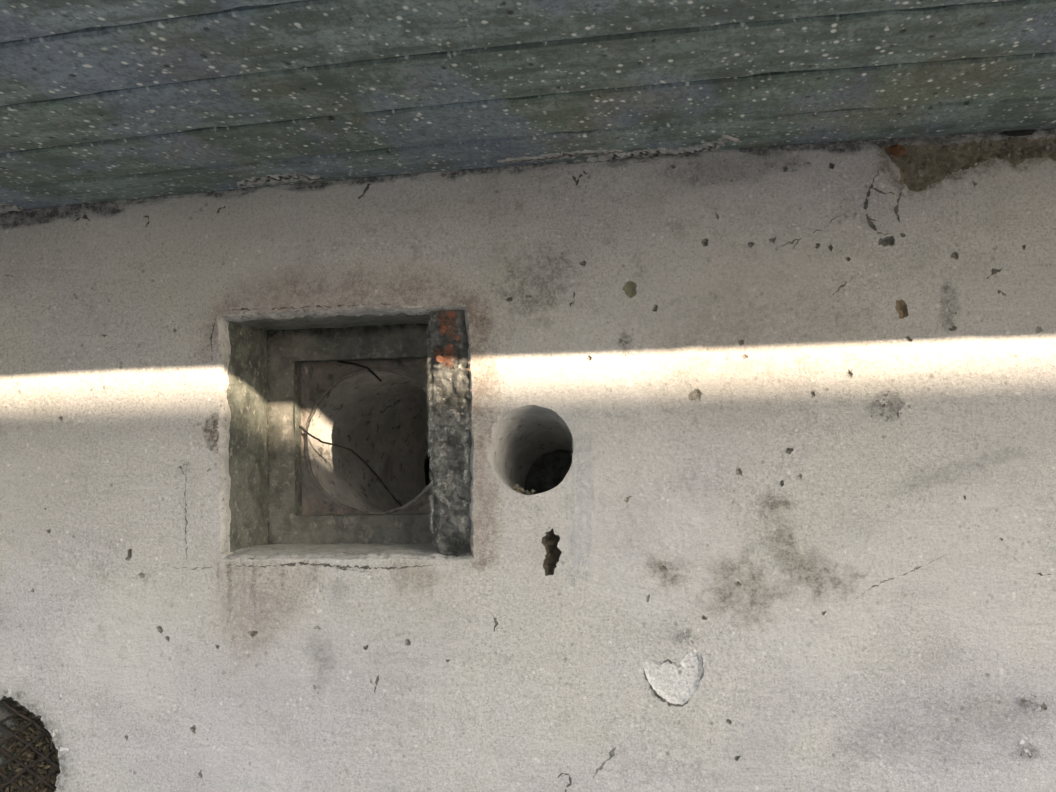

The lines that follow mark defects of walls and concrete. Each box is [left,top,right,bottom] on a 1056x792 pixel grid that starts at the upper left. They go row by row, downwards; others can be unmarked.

spalling [879,129,1056,192]
crack [769,168,901,247]
spalling [541,528,562,576]
peeling [642,648,704,707]
spalling [0,686,69,792]